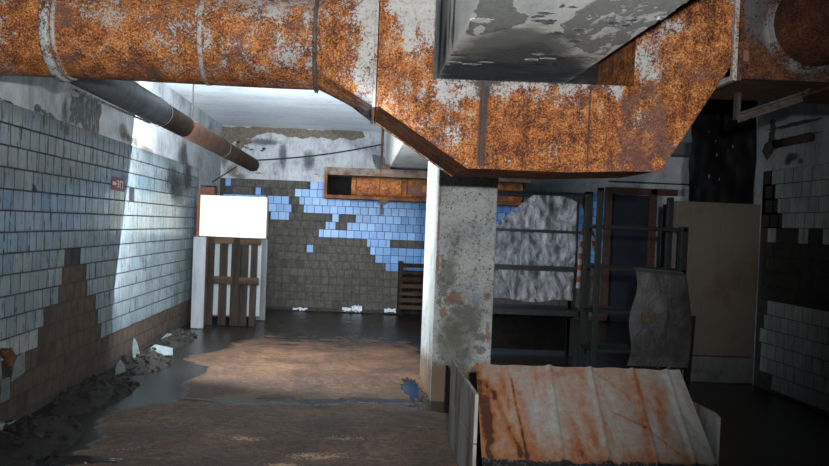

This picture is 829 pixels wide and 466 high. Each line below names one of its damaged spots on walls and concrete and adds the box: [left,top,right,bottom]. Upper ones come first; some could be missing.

peeling [466,0,687,55]
peeling [0,248,191,423]
peeling [220,178,398,311]
peeling [390,240,423,249]
peeling [493,263,602,318]
peeling [761,171,829,311]